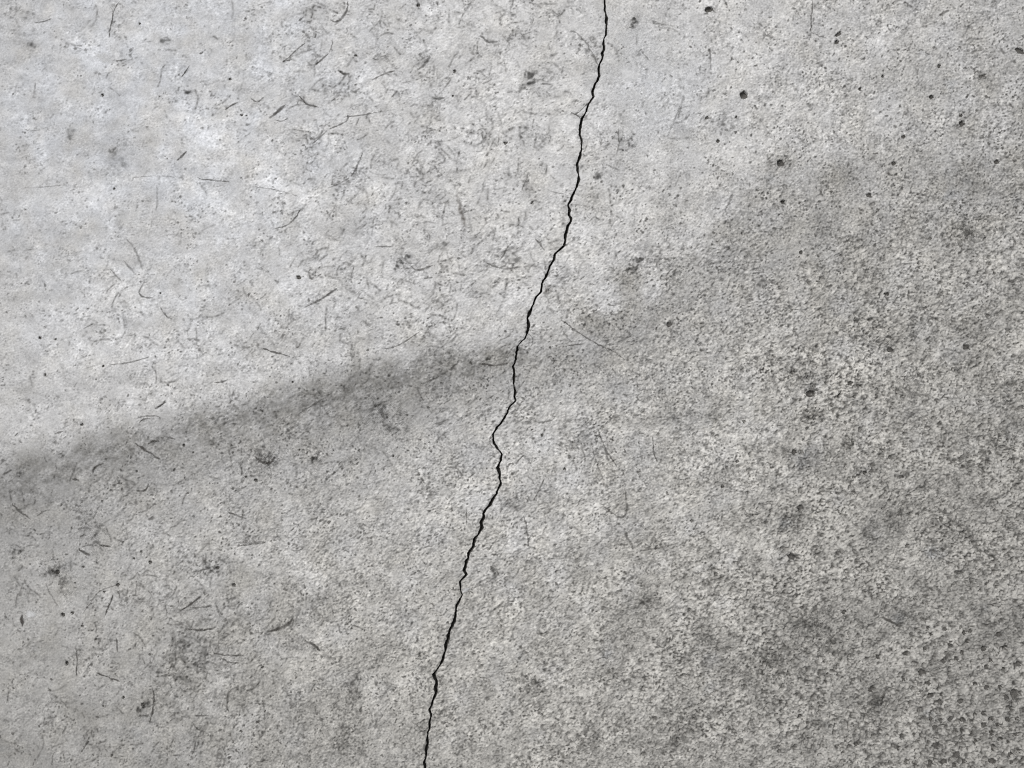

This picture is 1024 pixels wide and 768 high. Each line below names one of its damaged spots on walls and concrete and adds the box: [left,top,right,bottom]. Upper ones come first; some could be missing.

crack [423,0,608,768]